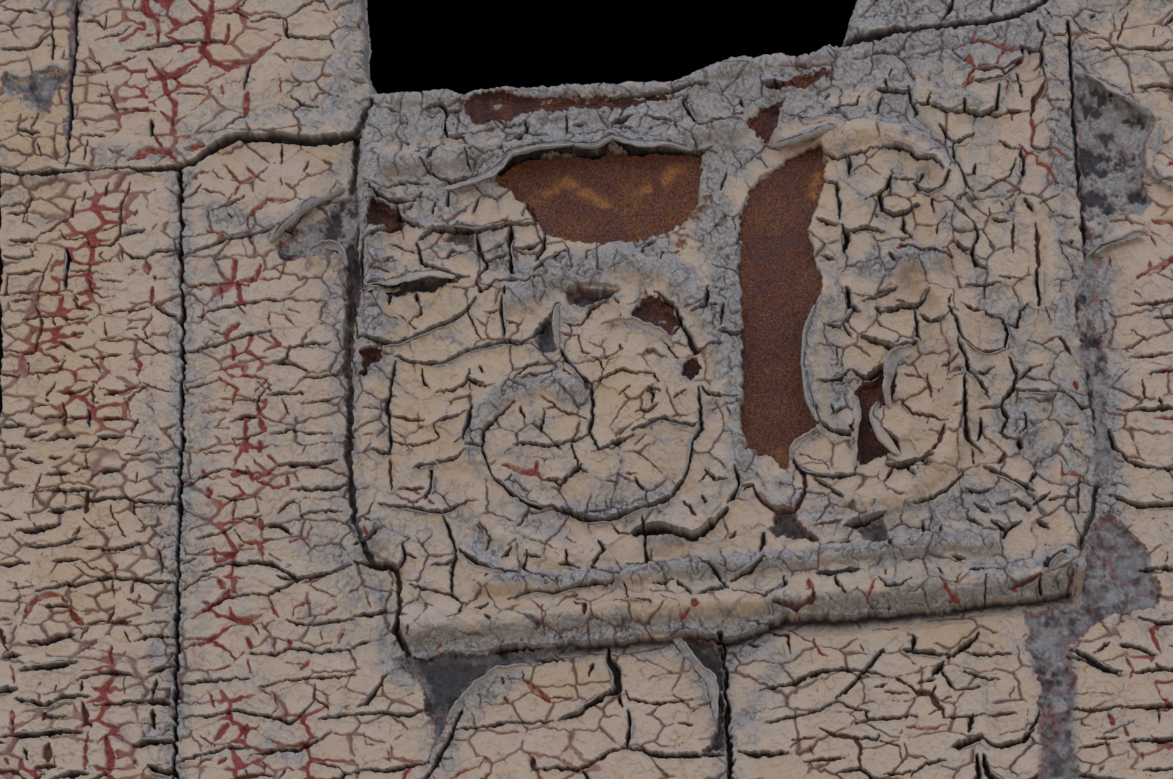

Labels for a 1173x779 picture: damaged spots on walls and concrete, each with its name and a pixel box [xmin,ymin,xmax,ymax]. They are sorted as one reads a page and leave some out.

crack [1,0,334,168]
peeling [461,90,678,134]
crack [944,0,955,20]
peeling [266,179,481,398]
crack [0,81,1041,779]
corrosion [444,135,726,264]
peeling [537,268,703,386]
corrosion [737,124,837,485]
peeling [757,485,819,542]
peeling [849,344,925,469]
crack [800,9,1173,680]
peeling [1073,69,1173,495]